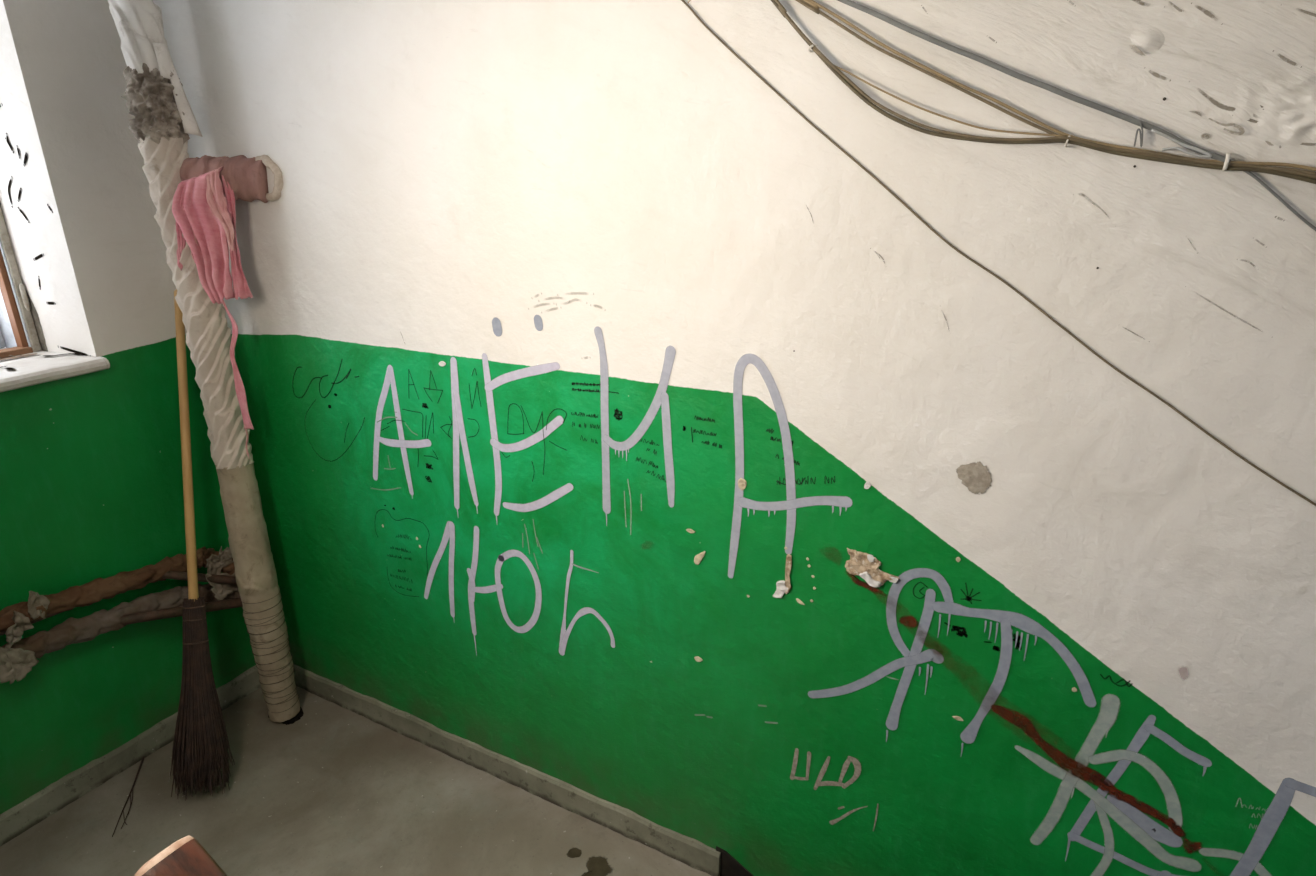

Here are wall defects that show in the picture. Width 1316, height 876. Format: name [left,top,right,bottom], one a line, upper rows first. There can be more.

corrosion [899,616,917,627]
corrosion [991,705,1201,854]